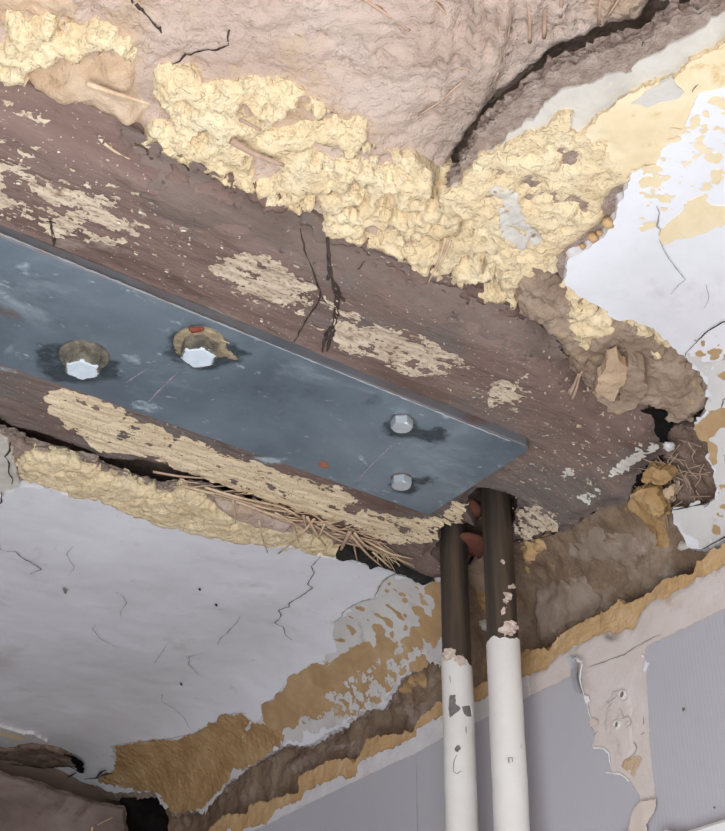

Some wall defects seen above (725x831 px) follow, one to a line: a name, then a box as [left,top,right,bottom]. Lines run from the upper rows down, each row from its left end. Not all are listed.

crack [131,0,162,33]
crack [173,30,230,64]
crack [294,228,346,353]
spalling [0,0,725,511]
crack [0,442,13,504]
peeling [16,387,469,558]
peeling [513,506,559,541]
crack [275,562,316,640]
peeling [498,583,519,637]
flaking render [521,504,725,678]
peeling [97,574,468,814]
flaking render [209,681,488,831]